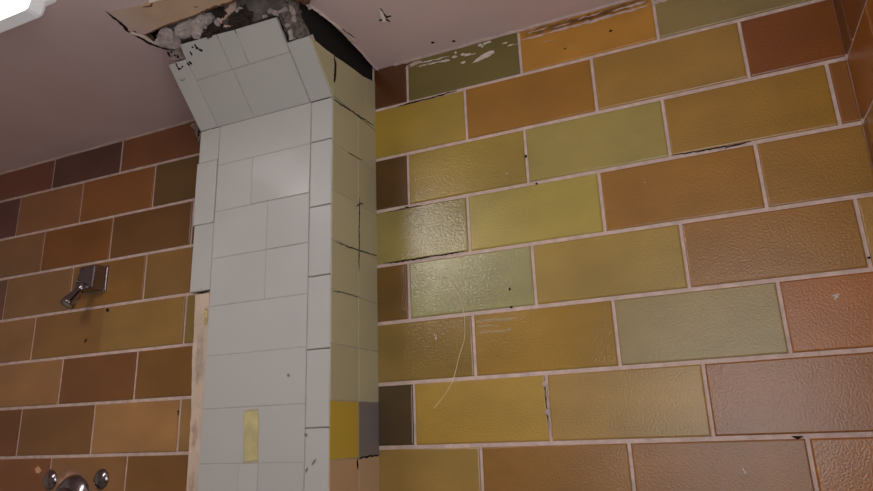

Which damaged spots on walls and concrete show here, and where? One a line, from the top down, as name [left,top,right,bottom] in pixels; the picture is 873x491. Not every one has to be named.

spalling [154,0,379,71]